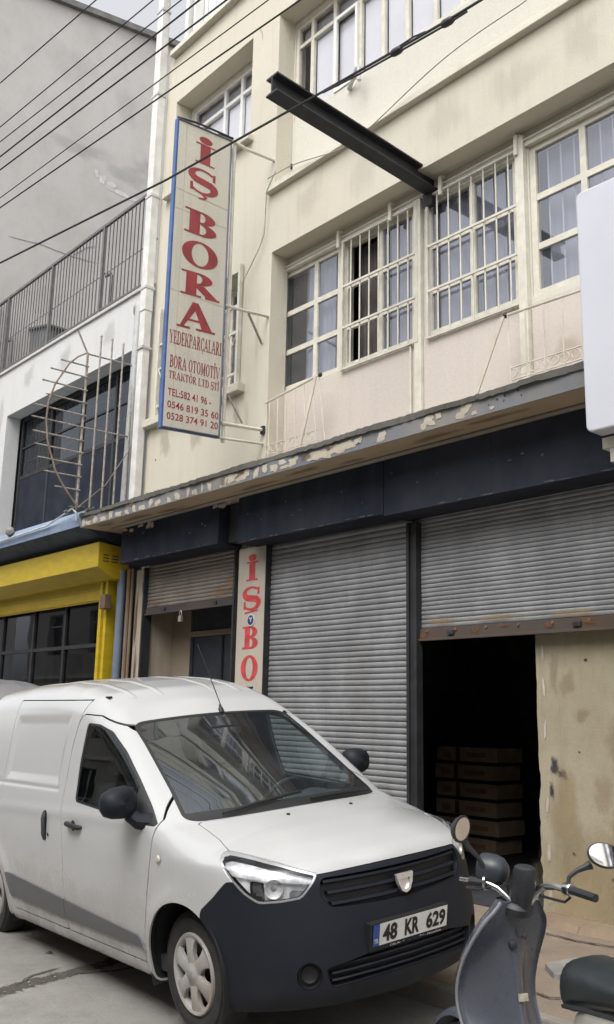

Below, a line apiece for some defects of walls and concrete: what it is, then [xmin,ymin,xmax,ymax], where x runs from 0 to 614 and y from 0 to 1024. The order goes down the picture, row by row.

peeling [421,412,441,430]
peeling [455,402,477,419]
peeling [82,436,362,560]
damp [550,758,565,796]